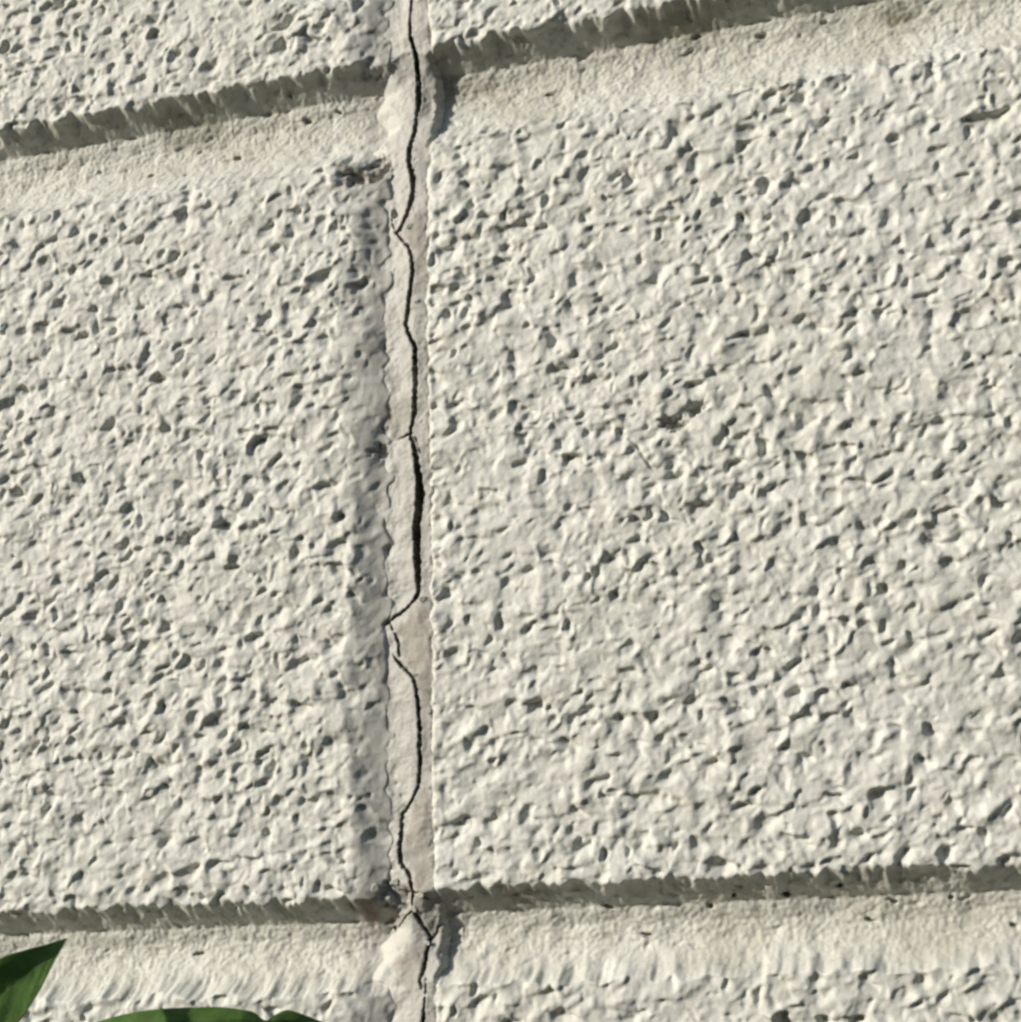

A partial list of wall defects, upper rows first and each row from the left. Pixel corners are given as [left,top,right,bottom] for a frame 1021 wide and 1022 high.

crack [386,0,441,1022]